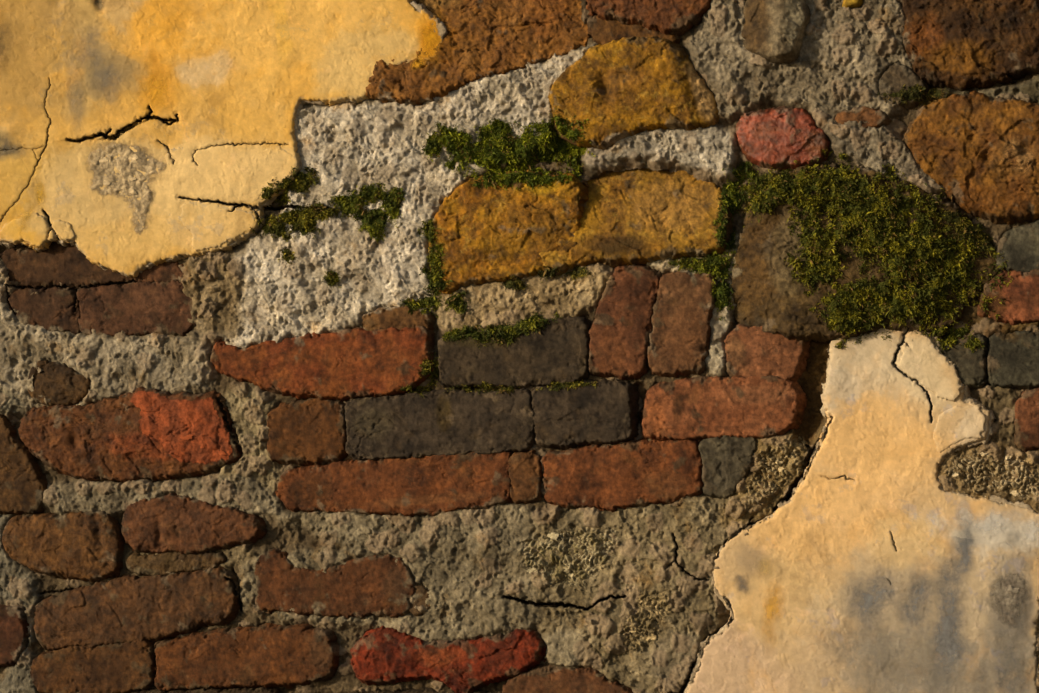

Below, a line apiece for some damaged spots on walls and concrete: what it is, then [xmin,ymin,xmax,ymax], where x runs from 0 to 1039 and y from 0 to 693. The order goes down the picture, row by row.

peeling [0,213,76,250]
spalling [88,143,185,234]
crack [0,79,289,222]
peeling [178,146,302,255]
crack [179,197,340,228]
crack [893,327,932,423]
peeling [899,330,1039,503]
spalling [738,432,810,511]
leakage [842,509,1003,693]
spalling [990,574,1027,625]